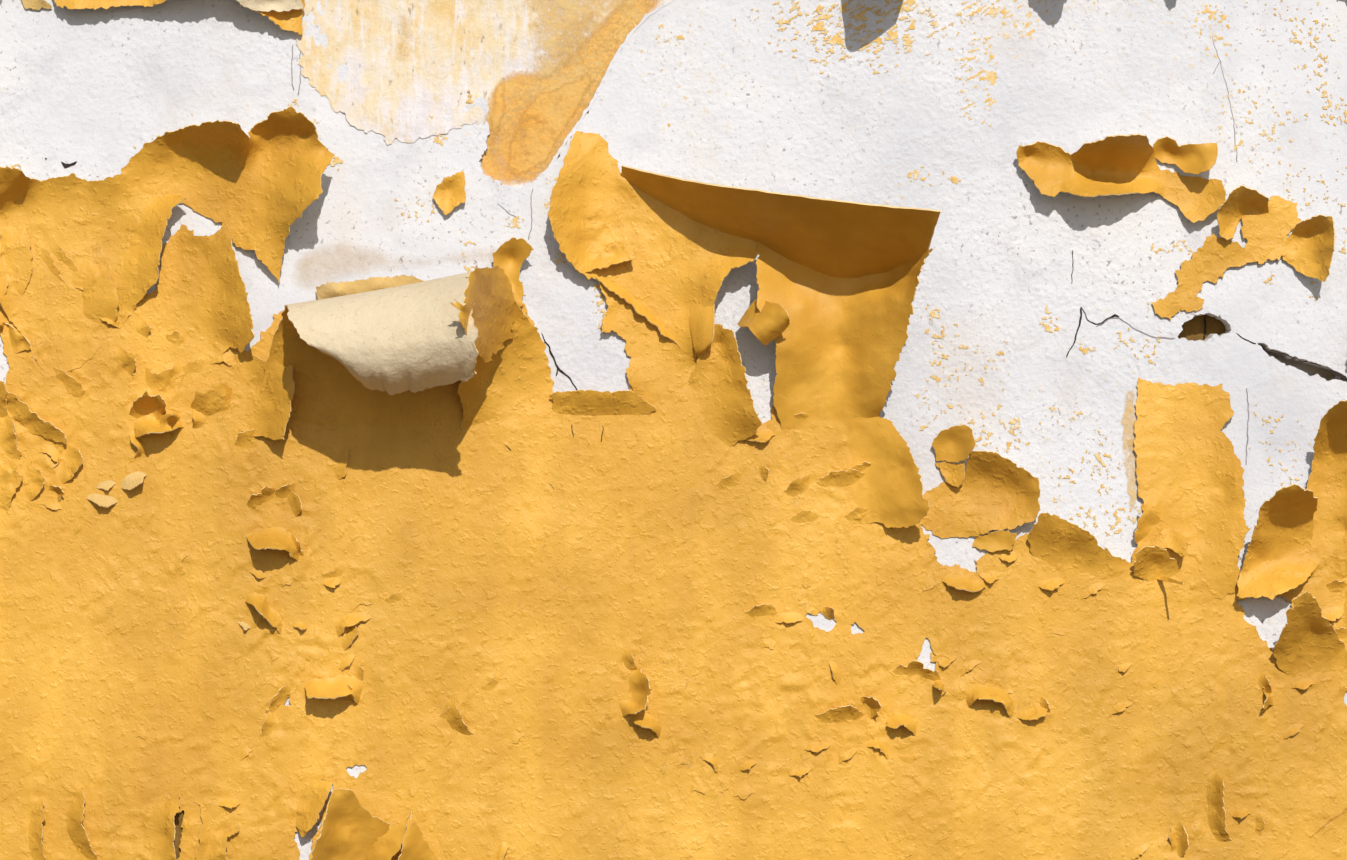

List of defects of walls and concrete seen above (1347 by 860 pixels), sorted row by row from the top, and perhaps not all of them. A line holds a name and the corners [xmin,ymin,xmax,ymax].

peeling [0,0,1347,651]
crack [1066,250,1175,357]
crack [1236,333,1347,380]
peeling [260,612,372,737]
peeling [892,638,1050,721]
peeling [1257,673,1274,709]
peeling [439,697,474,736]
peeling [814,696,917,736]
peeling [346,765,367,778]
peeling [174,812,184,859]
peeling [294,785,333,860]